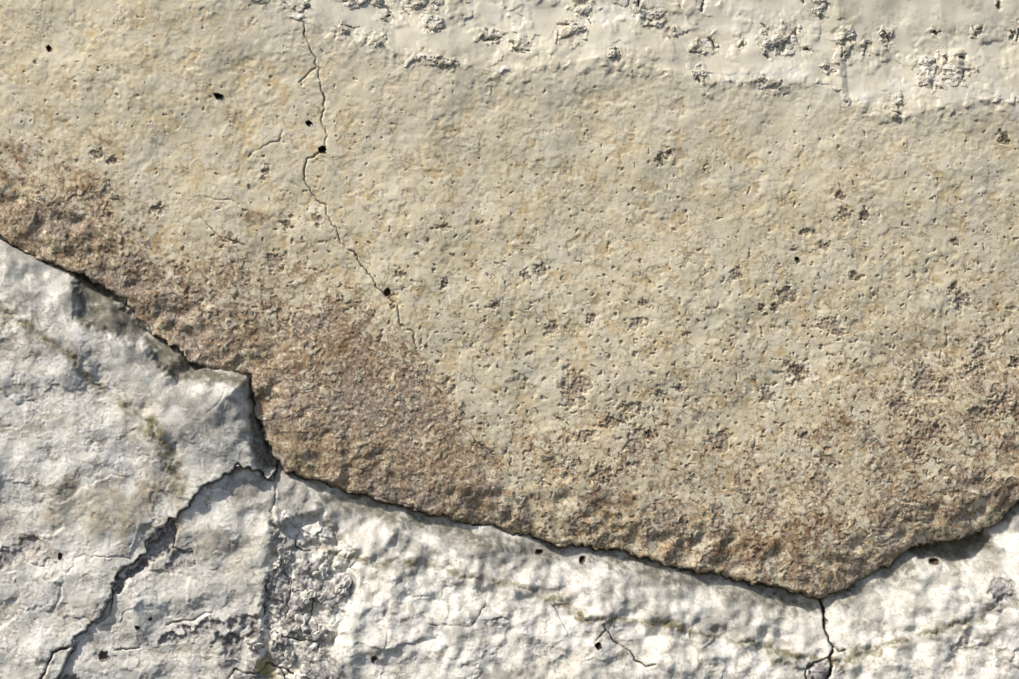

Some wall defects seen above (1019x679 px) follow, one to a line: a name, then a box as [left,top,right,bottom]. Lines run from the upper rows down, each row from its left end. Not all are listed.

peeling [401,53,450,68]
crack [299,27,418,351]
crack [0,235,129,307]
spalling [0,134,1019,598]
spalling [159,547,356,679]
crack [40,391,841,679]
spalling [987,576,1015,602]